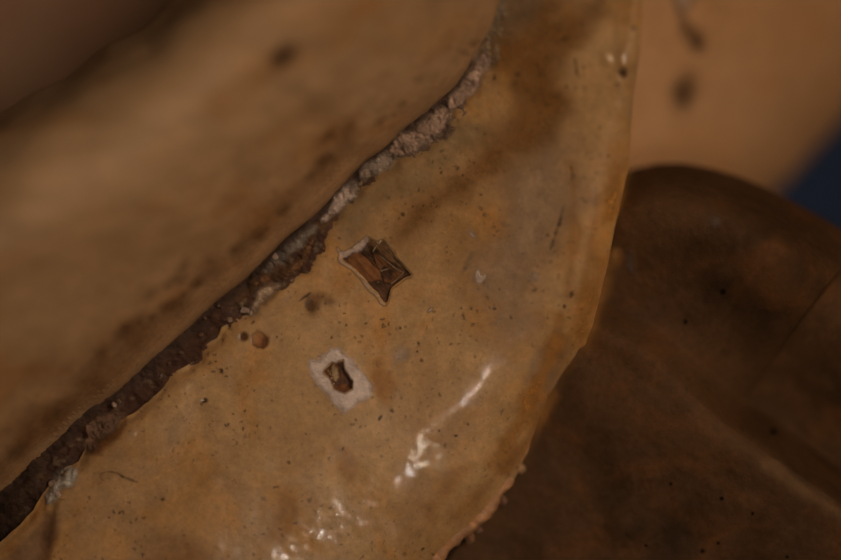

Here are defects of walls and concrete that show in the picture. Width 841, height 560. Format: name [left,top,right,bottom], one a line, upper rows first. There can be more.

spalling [336,236,413,306]